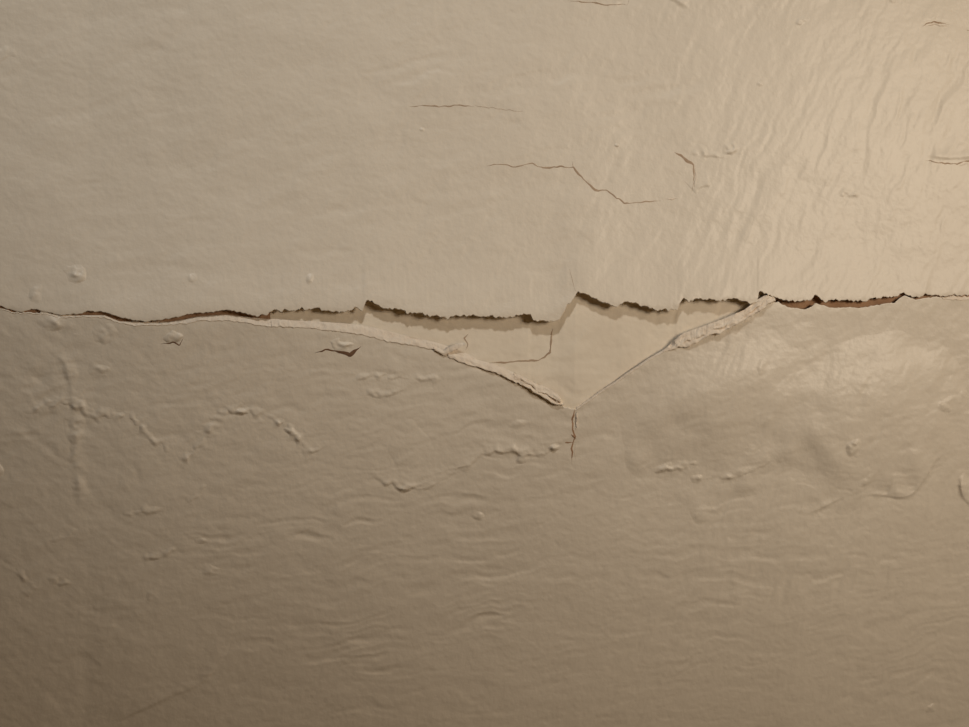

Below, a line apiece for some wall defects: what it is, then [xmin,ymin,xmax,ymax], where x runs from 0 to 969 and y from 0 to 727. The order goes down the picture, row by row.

crack [489,152,711,204]
crack [0,258,272,367]
peeling [270,249,776,446]
crack [773,252,969,344]
crack [565,409,577,460]